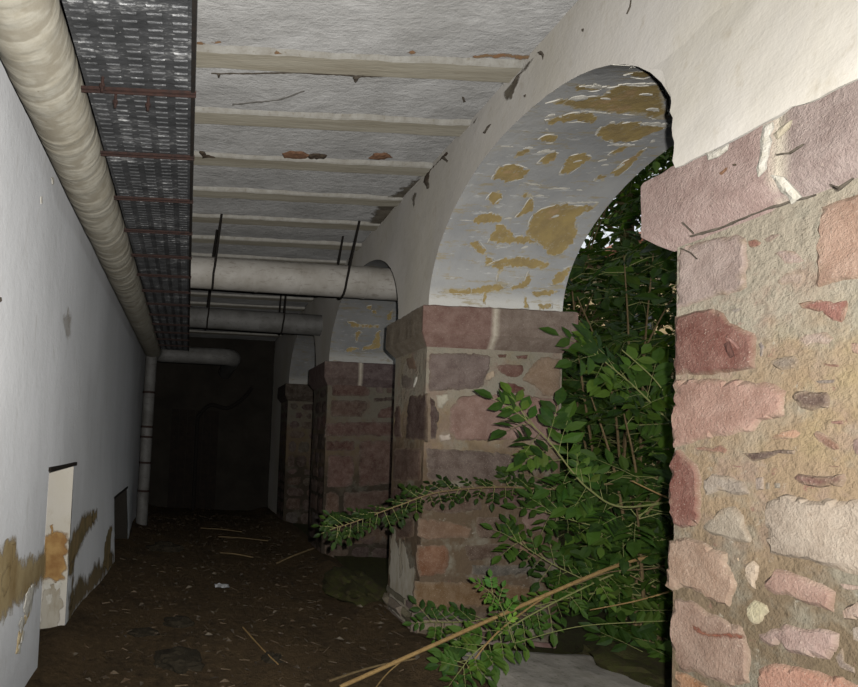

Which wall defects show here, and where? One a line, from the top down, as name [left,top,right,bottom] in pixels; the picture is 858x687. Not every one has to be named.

peeling [439,62,671,310]
peeling [15,580,63,654]